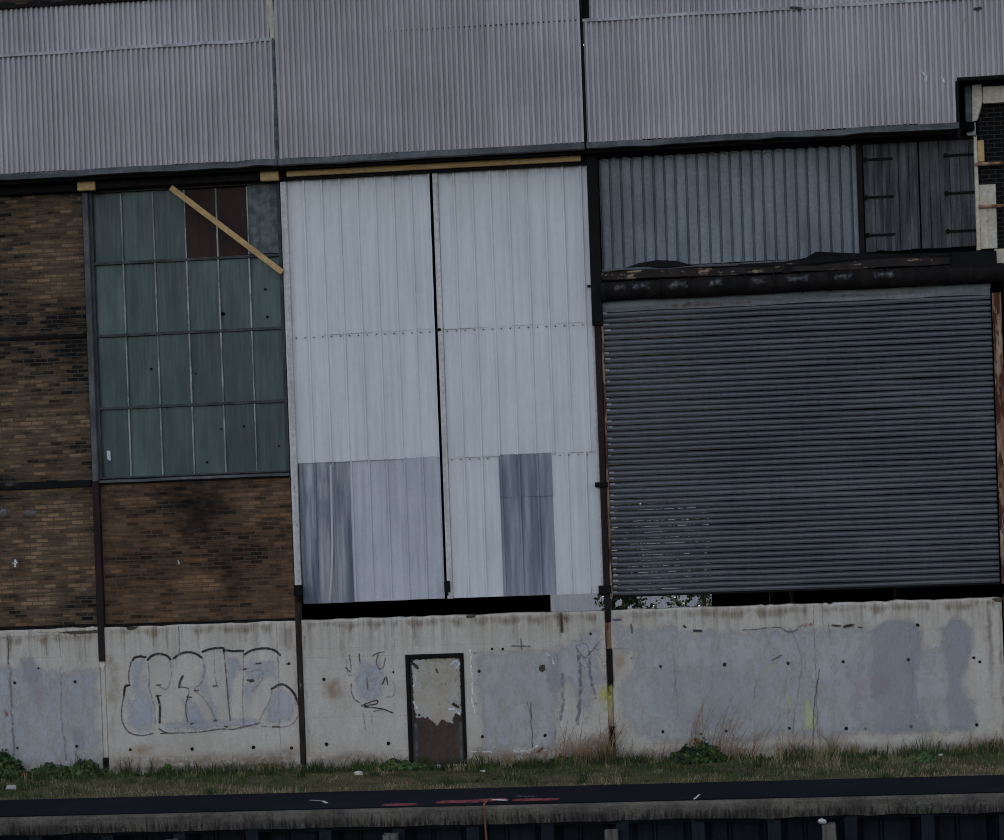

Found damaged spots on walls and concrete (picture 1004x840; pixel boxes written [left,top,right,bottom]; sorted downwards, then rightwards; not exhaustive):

peeling [411,657,462,726]
peeling [473,629,606,750]